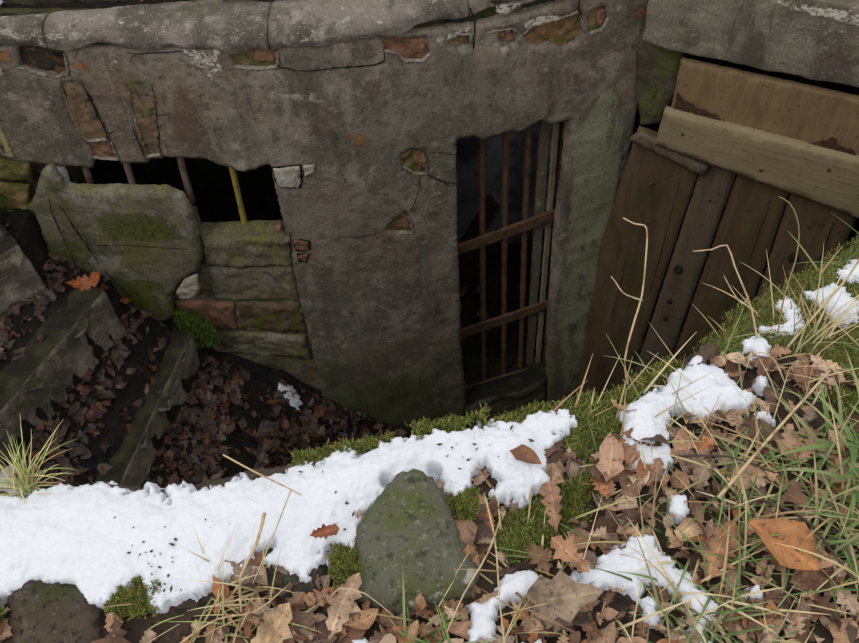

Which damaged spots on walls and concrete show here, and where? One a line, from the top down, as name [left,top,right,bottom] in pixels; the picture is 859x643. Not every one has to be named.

spalling [445,6,609,47]
crack [127,51,184,59]
spalling [232,49,279,71]
crack [275,47,385,72]
spalling [383,36,431,63]
crack [59,82,167,163]
spalling [400,149,429,175]
spalling [270,163,316,189]
crack [48,198,190,295]